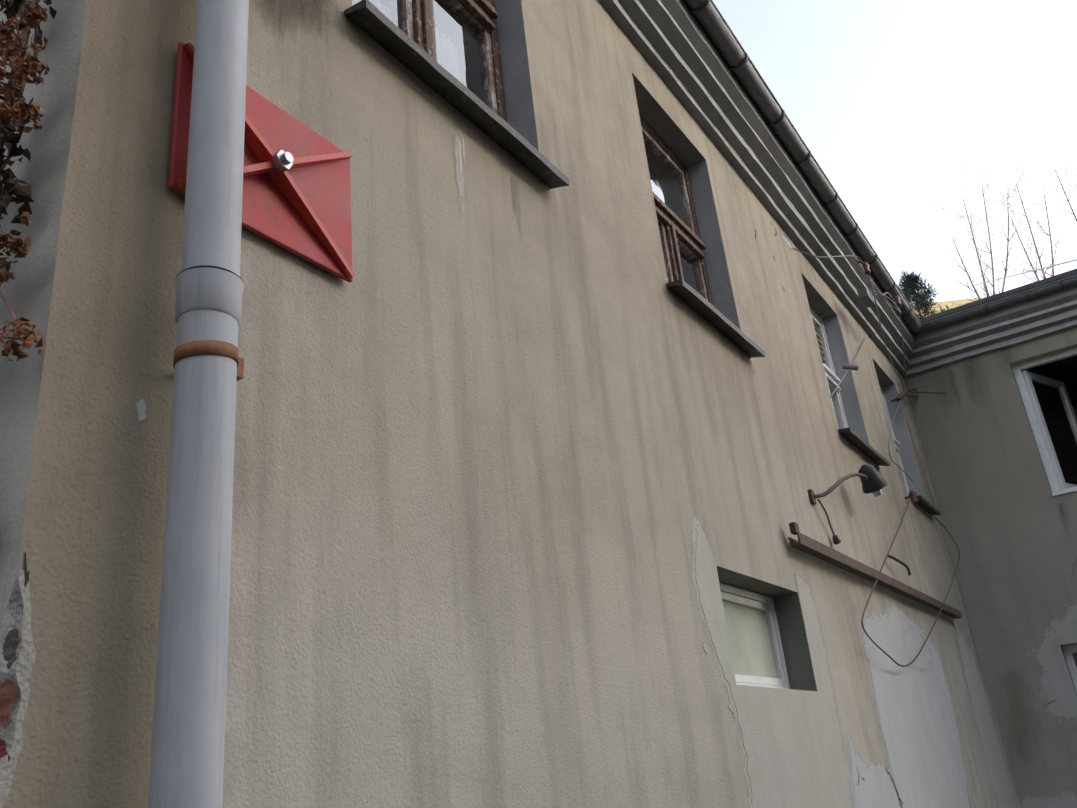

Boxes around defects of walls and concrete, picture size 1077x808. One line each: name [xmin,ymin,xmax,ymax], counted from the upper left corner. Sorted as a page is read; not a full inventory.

spalling [0,570,36,808]